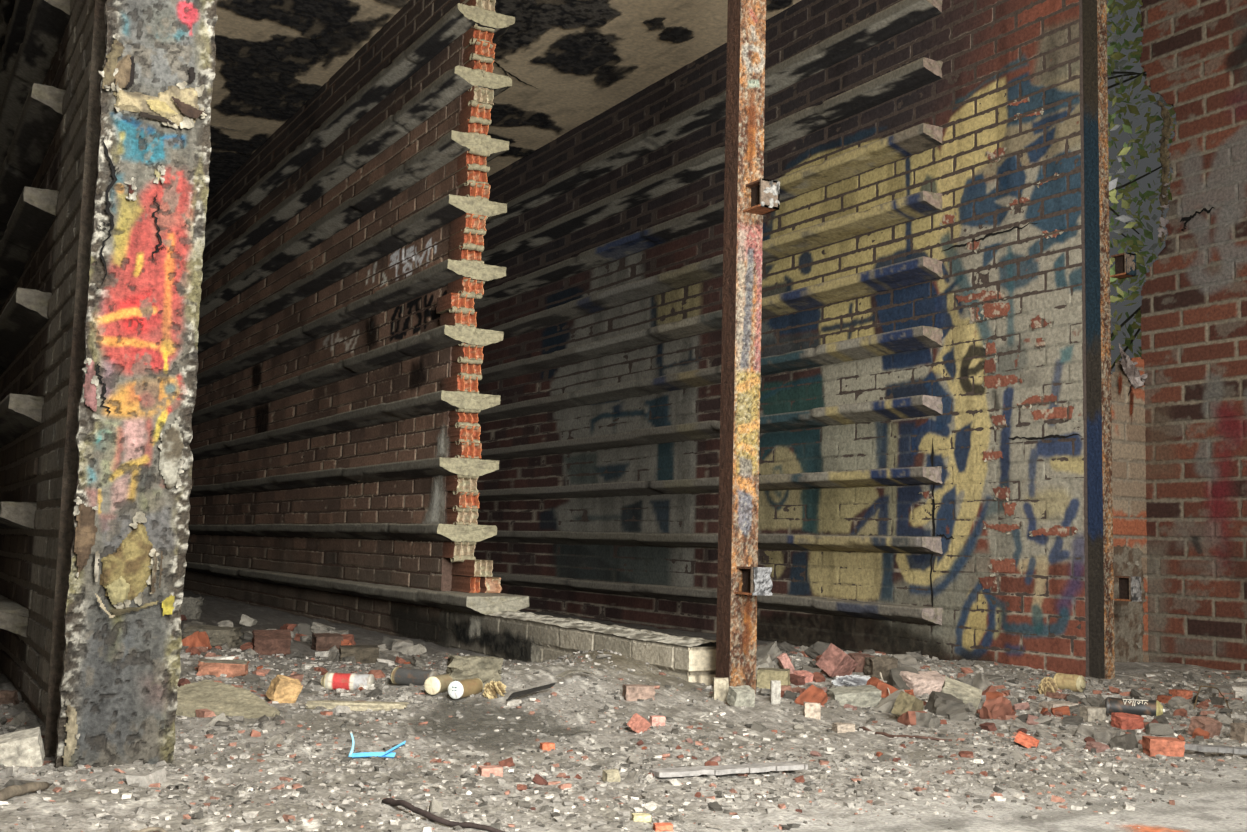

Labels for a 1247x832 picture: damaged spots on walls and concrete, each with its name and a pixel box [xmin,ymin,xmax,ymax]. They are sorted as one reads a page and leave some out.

spalling [98,33,207,129]
rust [746,106,756,161]
peeling [124,177,137,201]
peeling [153,165,166,184]
crack [152,195,164,260]
crack [943,223,1037,251]
peeling [82,358,100,411]
peeling [1017,394,1074,422]
peeling [158,416,184,489]
peeling [983,486,1078,537]
spalling [73,497,175,618]
peeling [62,699,80,767]